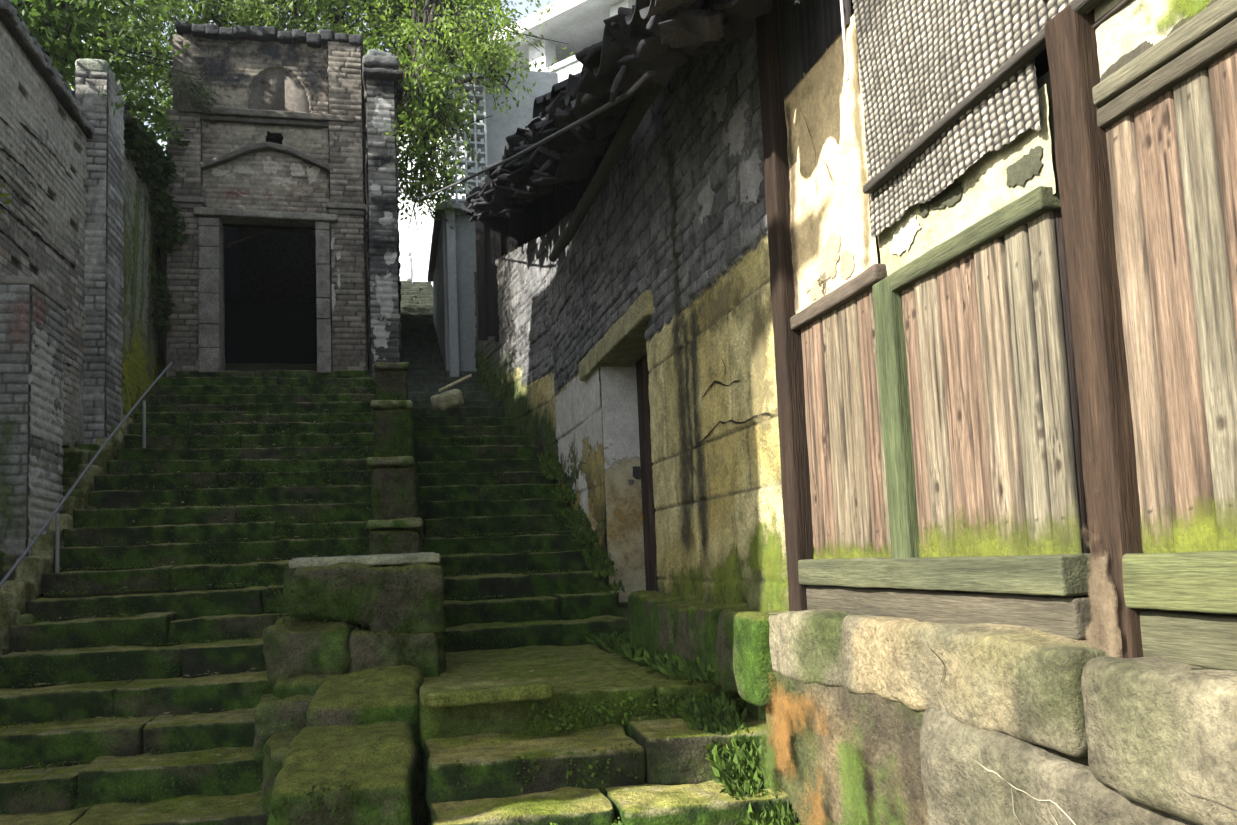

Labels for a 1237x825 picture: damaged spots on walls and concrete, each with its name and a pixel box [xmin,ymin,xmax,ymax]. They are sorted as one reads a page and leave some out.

flaking render [1100,41,1153,82]
spalling [371,95,393,142]
flaking render [1006,145,1042,187]
flaking render [883,178,962,256]
damp [121,181,161,378]
spalling [371,250,398,361]
damp [667,145,773,552]
crack [701,357,739,398]
crack [694,412,771,449]
rust [768,687,826,772]
rust [809,779,825,825]
crack [977,762,1076,825]